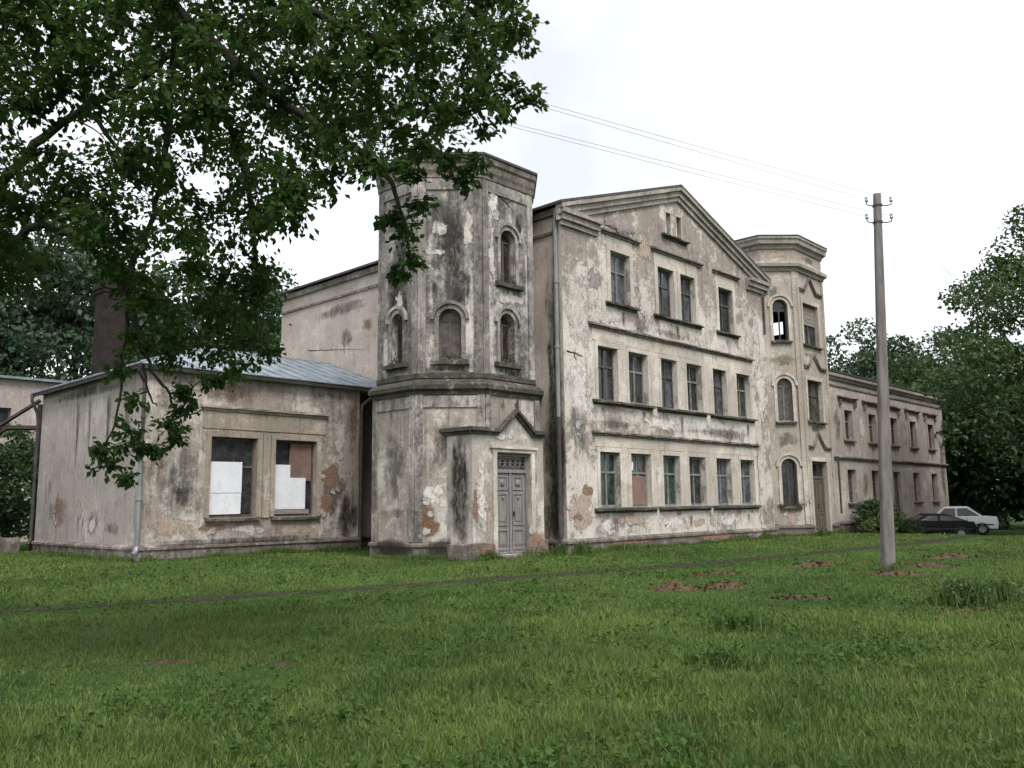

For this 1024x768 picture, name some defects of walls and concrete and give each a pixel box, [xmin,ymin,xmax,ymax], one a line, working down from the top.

peeling [432,220,447,236]
water stain [432,198,469,312]
water stain [544,287,584,535]
water stain [386,437,402,494]
water stain [330,491,356,537]
peeling [422,483,447,535]
water stain [428,436,468,555]
peeling [566,492,739,535]